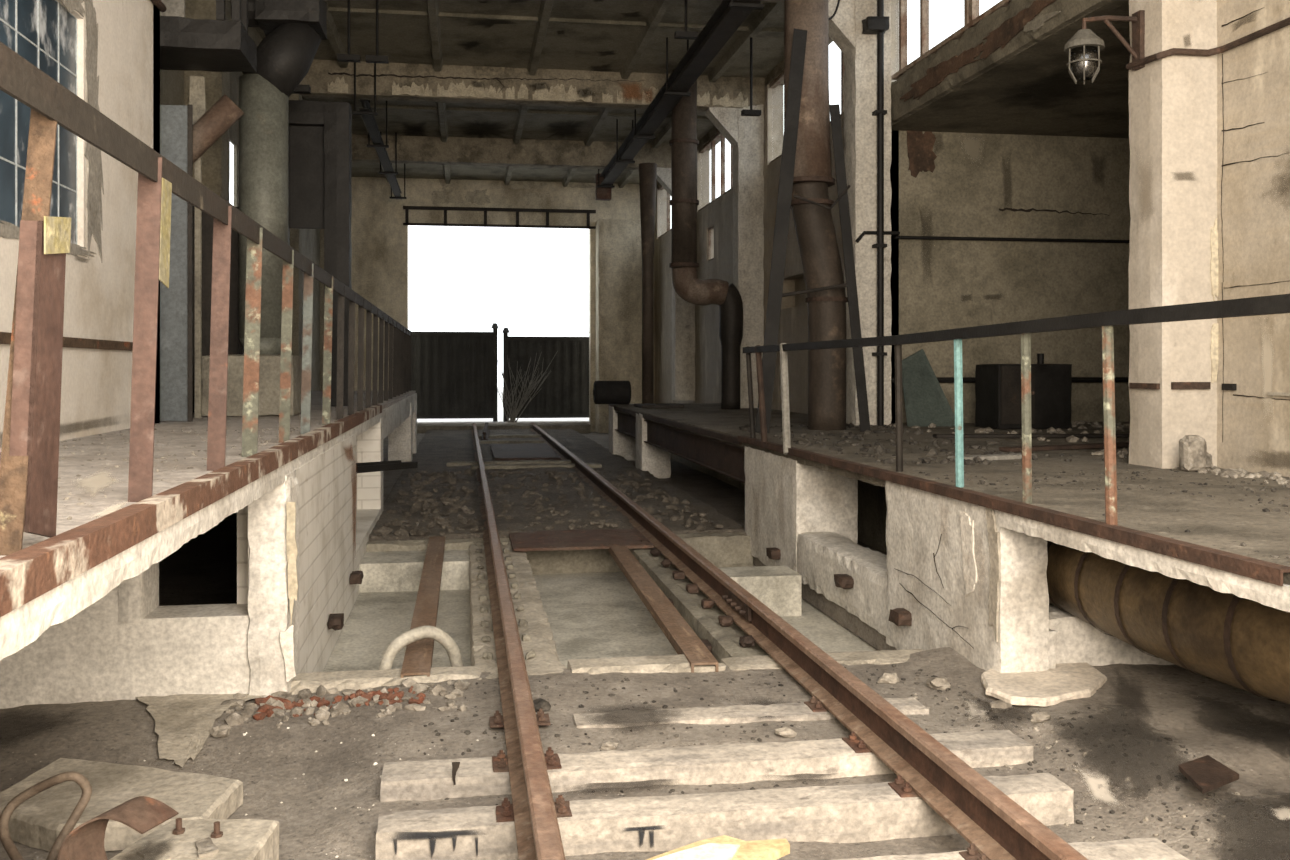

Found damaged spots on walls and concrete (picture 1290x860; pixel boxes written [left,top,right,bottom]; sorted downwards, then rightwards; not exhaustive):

peeling [328,76,348,93]
peeling [392,80,659,104]
peeling [697,91,748,108]